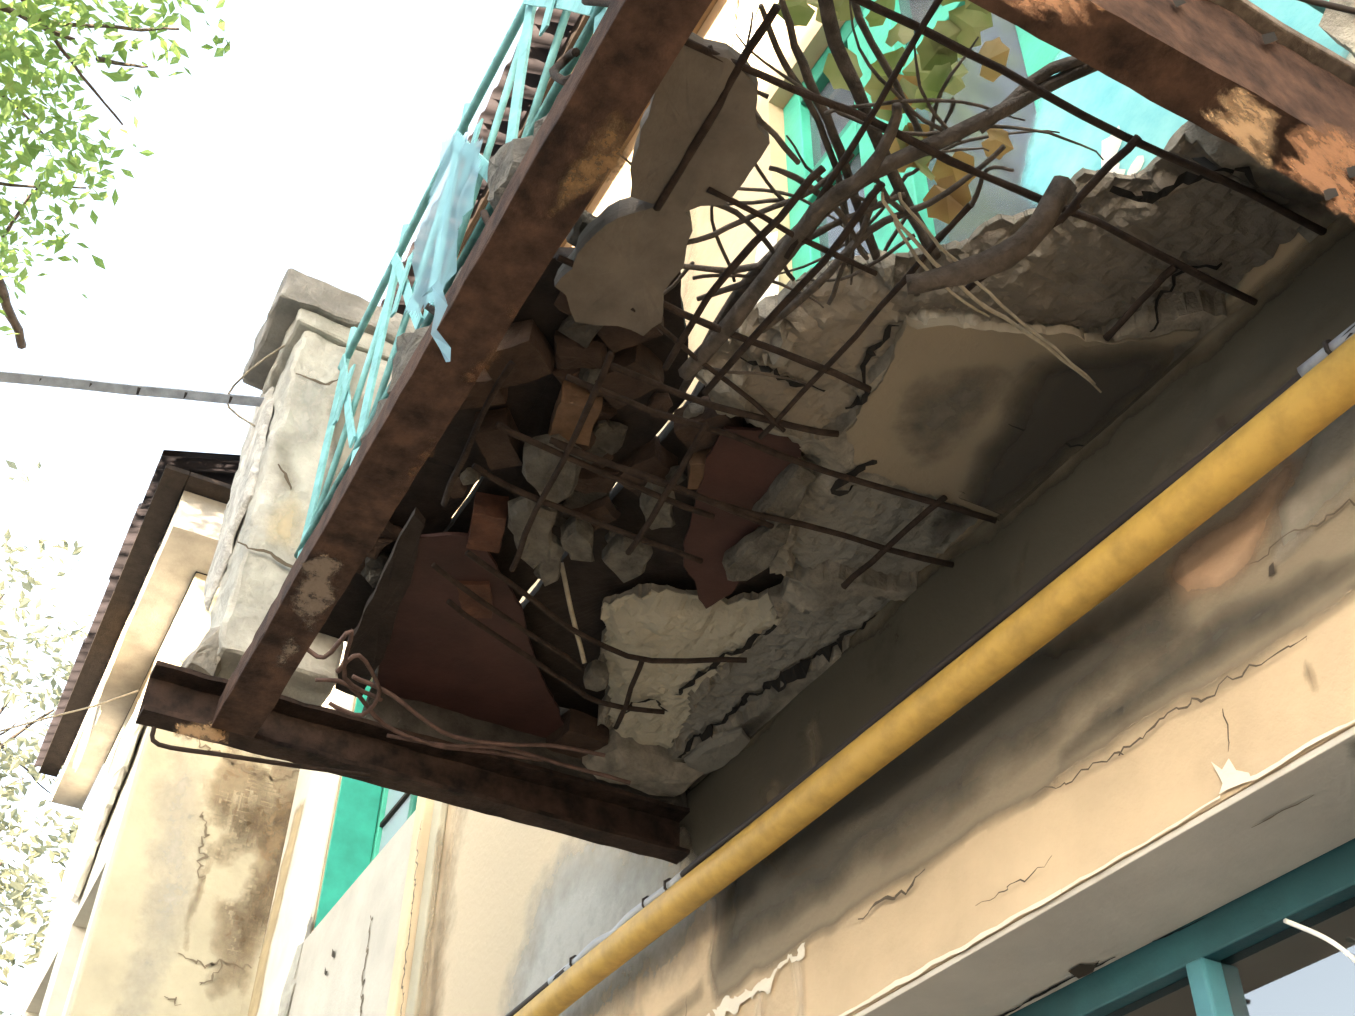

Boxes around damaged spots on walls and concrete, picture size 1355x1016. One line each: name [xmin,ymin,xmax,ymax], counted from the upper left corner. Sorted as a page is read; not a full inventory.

corrosion [558,120,627,206]
corrosion [1206,89,1355,221]
flaking render [441,0,1327,749]
water stain [679,178,1355,863]
corrosion [175,722,227,742]
water stain [710,438,1355,998]
crack [1032,636,1307,796]
crack [164,953,260,1006]
water stain [246,796,303,1016]
crack [360,915,373,1016]
peeling [707,943,805,1016]
peeling [839,720,1355,1016]